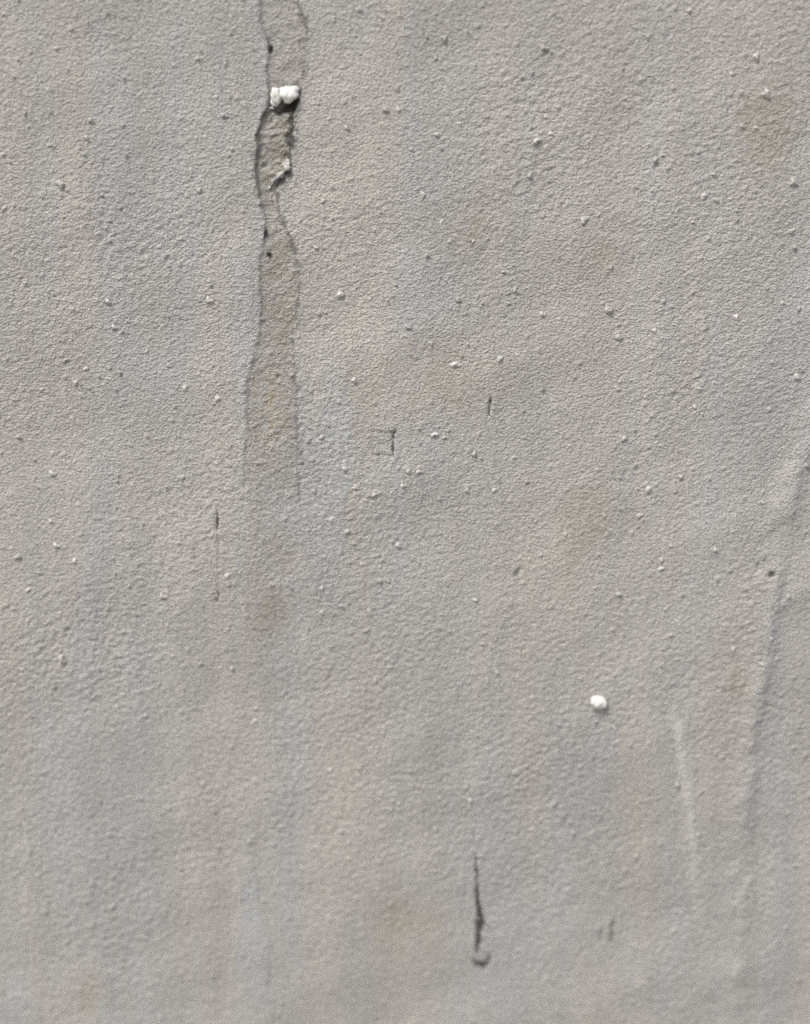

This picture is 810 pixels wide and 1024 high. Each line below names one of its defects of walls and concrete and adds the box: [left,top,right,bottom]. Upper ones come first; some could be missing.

peeling [236,0,308,792]
crack [472,853,490,968]